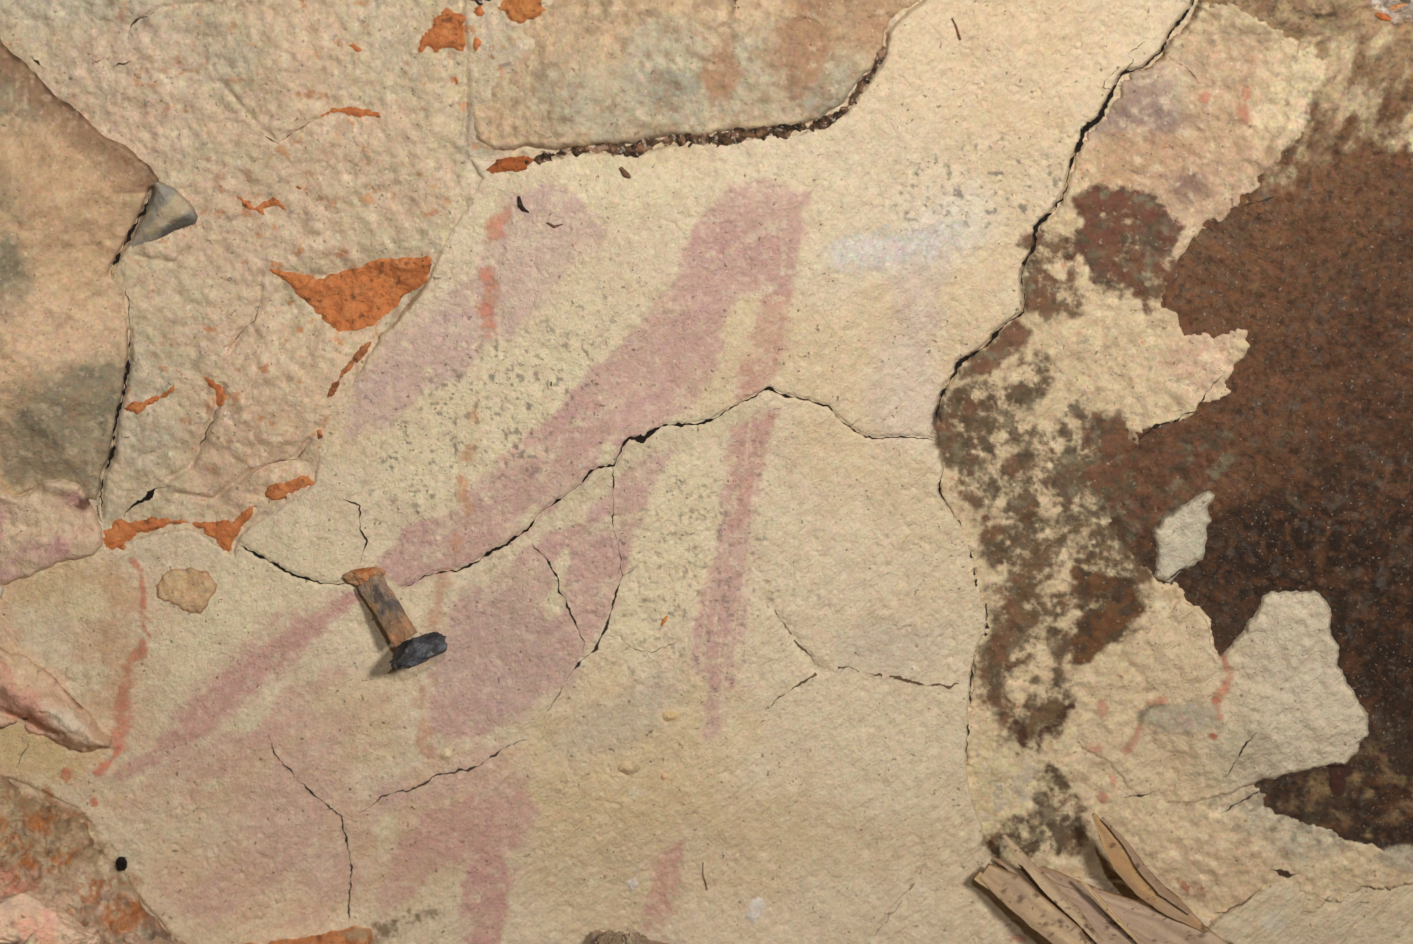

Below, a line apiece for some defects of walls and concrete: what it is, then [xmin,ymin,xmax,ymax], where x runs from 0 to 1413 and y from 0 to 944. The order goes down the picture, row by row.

crack [1135,375,1223,444]
crack [268,0,1201,919]
crack [242,499,368,585]
corrosion [1210,655,1232,739]